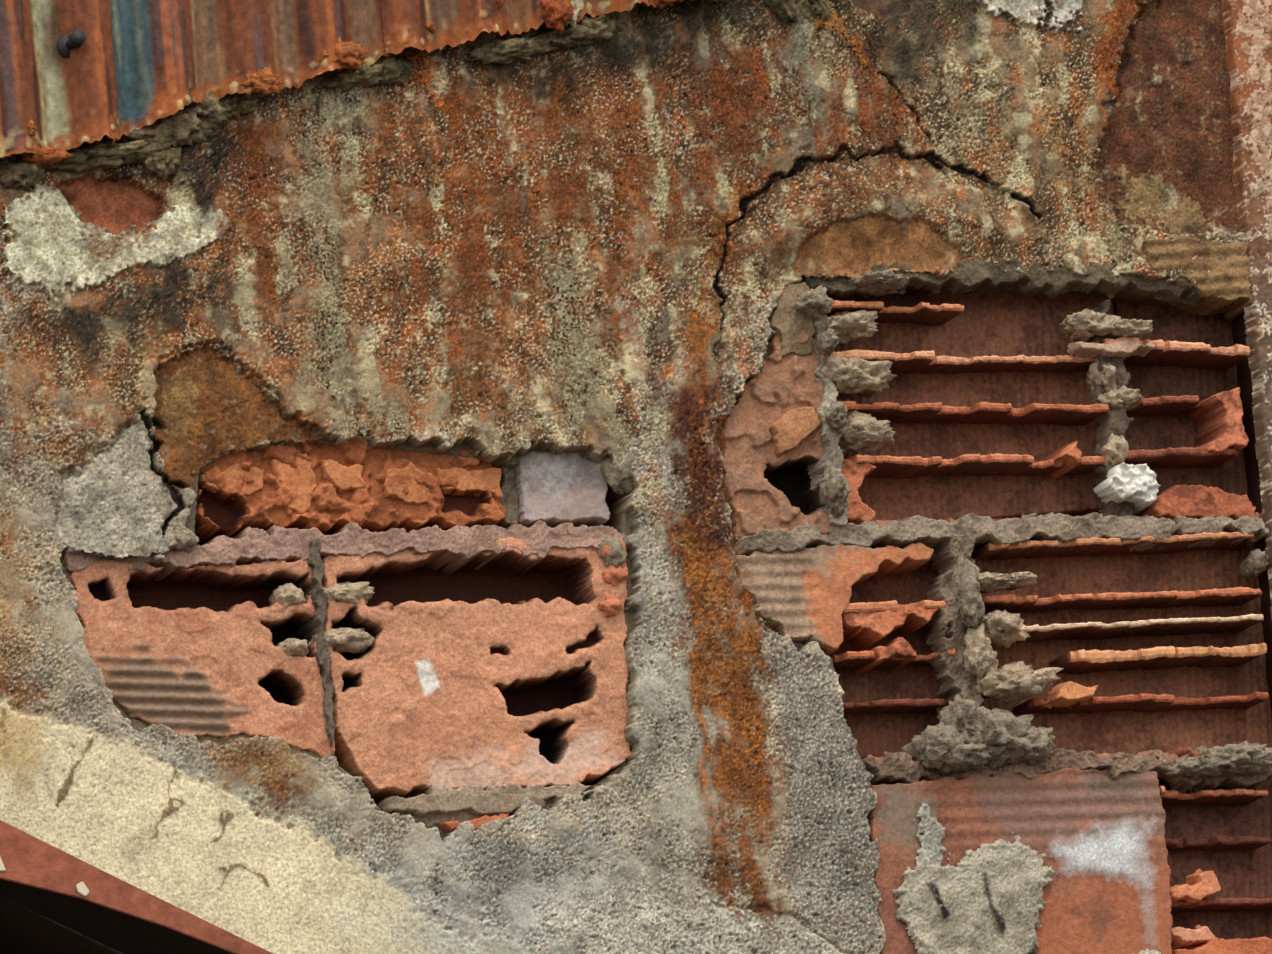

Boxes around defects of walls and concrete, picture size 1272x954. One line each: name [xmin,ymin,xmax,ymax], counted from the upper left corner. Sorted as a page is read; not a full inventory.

corrosion [20,120,73,165]
corrosion [215,113,293,327]
corrosion [239,68,283,96]
corrosion [318,37,369,72]
corrosion [366,52,659,415]
corrosion [539,0,584,34]
crack [713,73,1041,318]
corrosion [1096,0,1147,123]
corrosion [666,8,951,921]
spalling [718,0,1272,954]
spalling [54,345,634,833]
efflorescence [1056,826,1147,883]